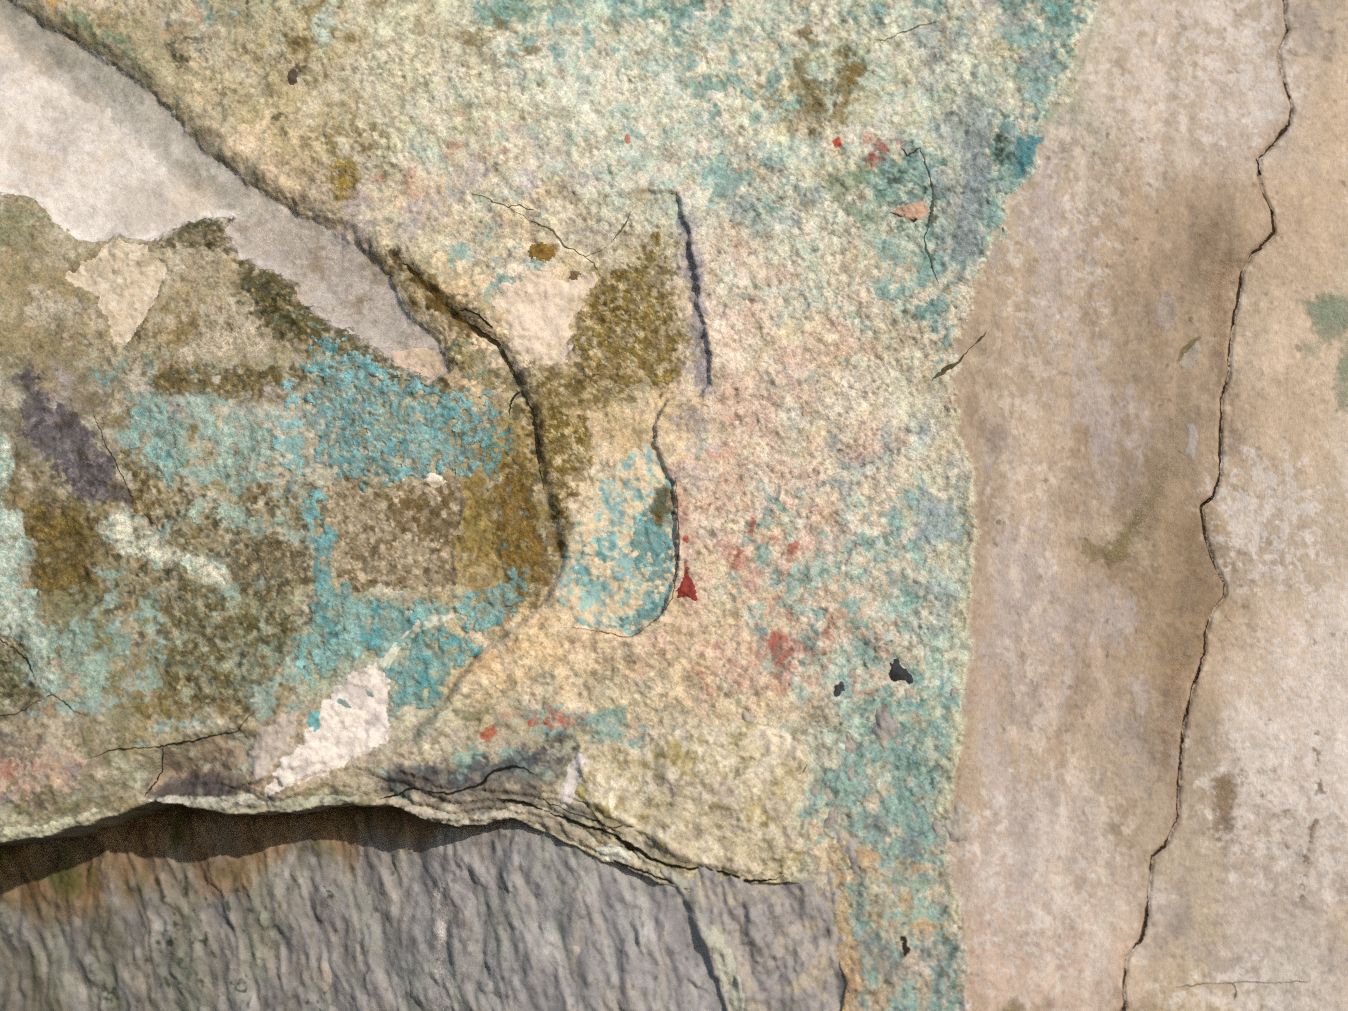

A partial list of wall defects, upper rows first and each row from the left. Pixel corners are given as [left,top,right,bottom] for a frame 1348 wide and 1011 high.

spalling [0,0,527,812]
crack [399,258,544,489]
crack [932,331,987,381]
crack [1121,0,1309,1011]
peeling [0,808,100,842]
spalling [398,719,809,880]
peeling [701,925,750,1011]